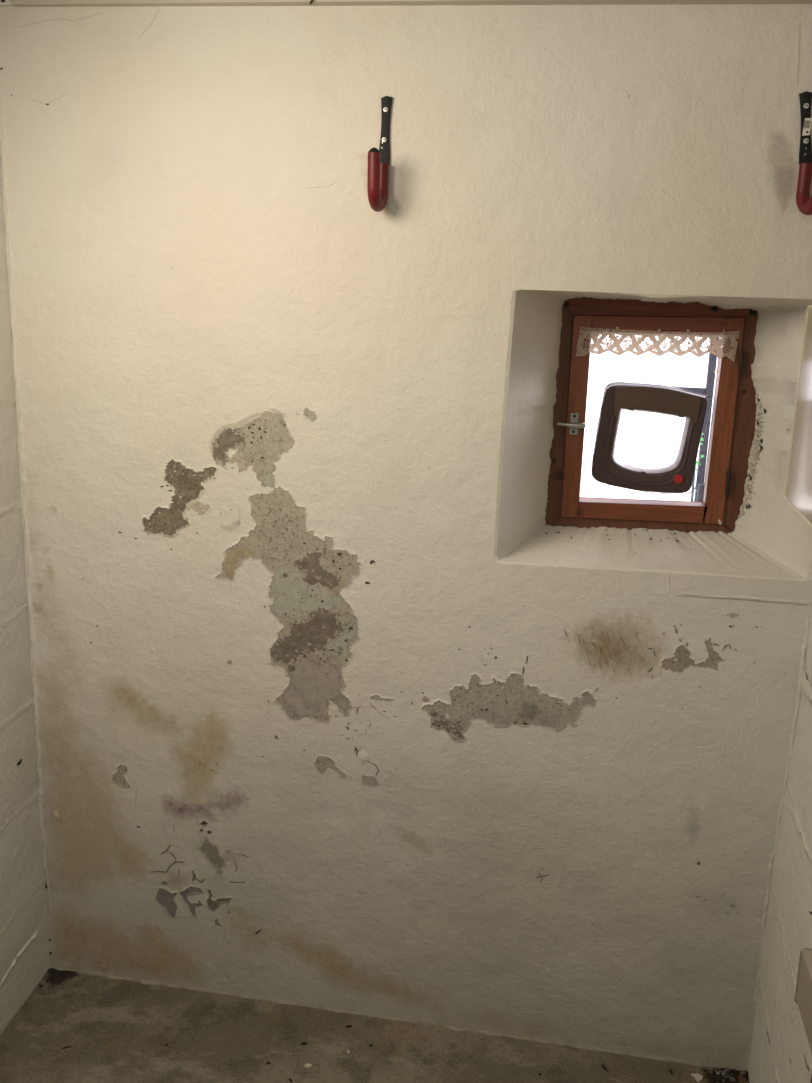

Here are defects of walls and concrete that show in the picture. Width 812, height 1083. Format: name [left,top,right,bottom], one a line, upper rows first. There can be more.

flaking render [141,406,395,756]
flaking render [659,624,737,673]
flaking render [420,645,599,743]
peeling [313,752,380,787]
crack [151,827,249,883]
leakage [199,821,223,868]
peeling [153,881,232,926]